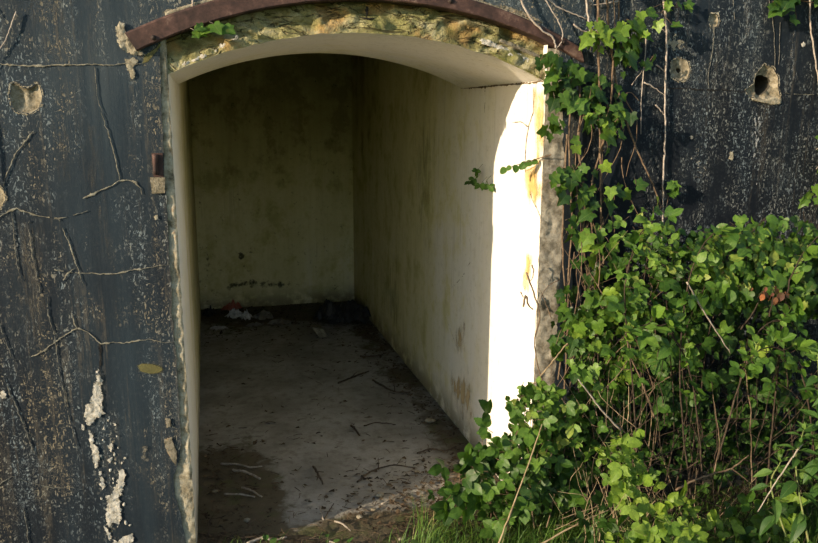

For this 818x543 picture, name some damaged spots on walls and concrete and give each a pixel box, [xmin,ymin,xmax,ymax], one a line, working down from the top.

spalling [708,12,721,30]
spalling [115,21,146,79]
spalling [668,34,691,83]
spalling [8,81,44,115]
spalling [745,63,782,105]
corrosion [525,93,543,203]